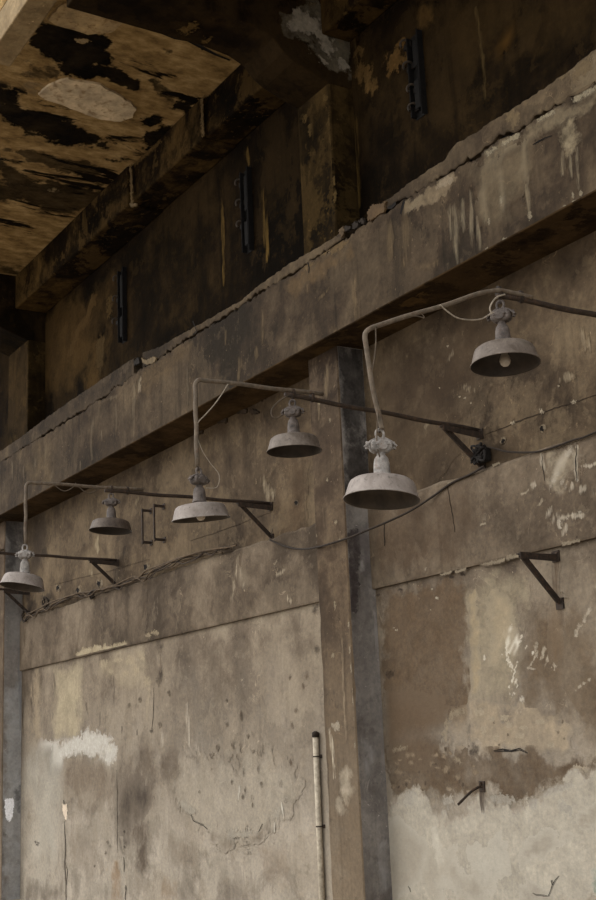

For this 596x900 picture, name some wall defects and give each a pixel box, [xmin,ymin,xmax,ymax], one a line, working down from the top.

peeling [19,77,137,122]
peeling [278,0,407,104]
damp [261,187,271,264]
damp [447,135,561,266]
damp [557,113,583,219]
damp [513,596,596,749]
peeling [45,724,118,767]
peeling [382,681,596,900]